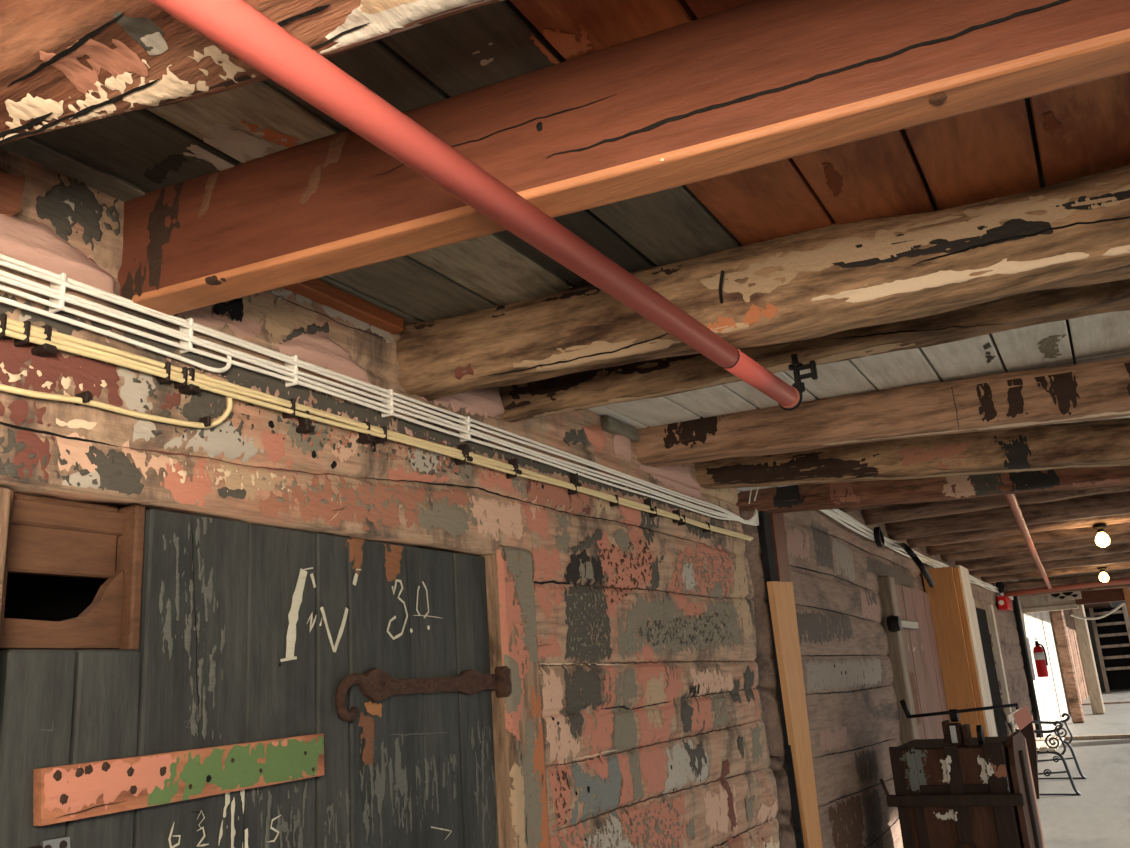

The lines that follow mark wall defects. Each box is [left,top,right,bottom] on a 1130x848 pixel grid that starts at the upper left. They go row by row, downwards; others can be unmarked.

peeling [319,0,504,55]
peeling [529,23,592,64]
peeling [0,32,256,141]
crack [546,0,1069,158]
peeling [183,119,300,171]
peeling [700,183,1130,334]
peeling [177,288,394,346]
peeling [766,343,915,372]
peeling [0,336,753,848]
rust [364,701,382,717]
peeling [750,662,764,765]
peeling [753,798,779,848]